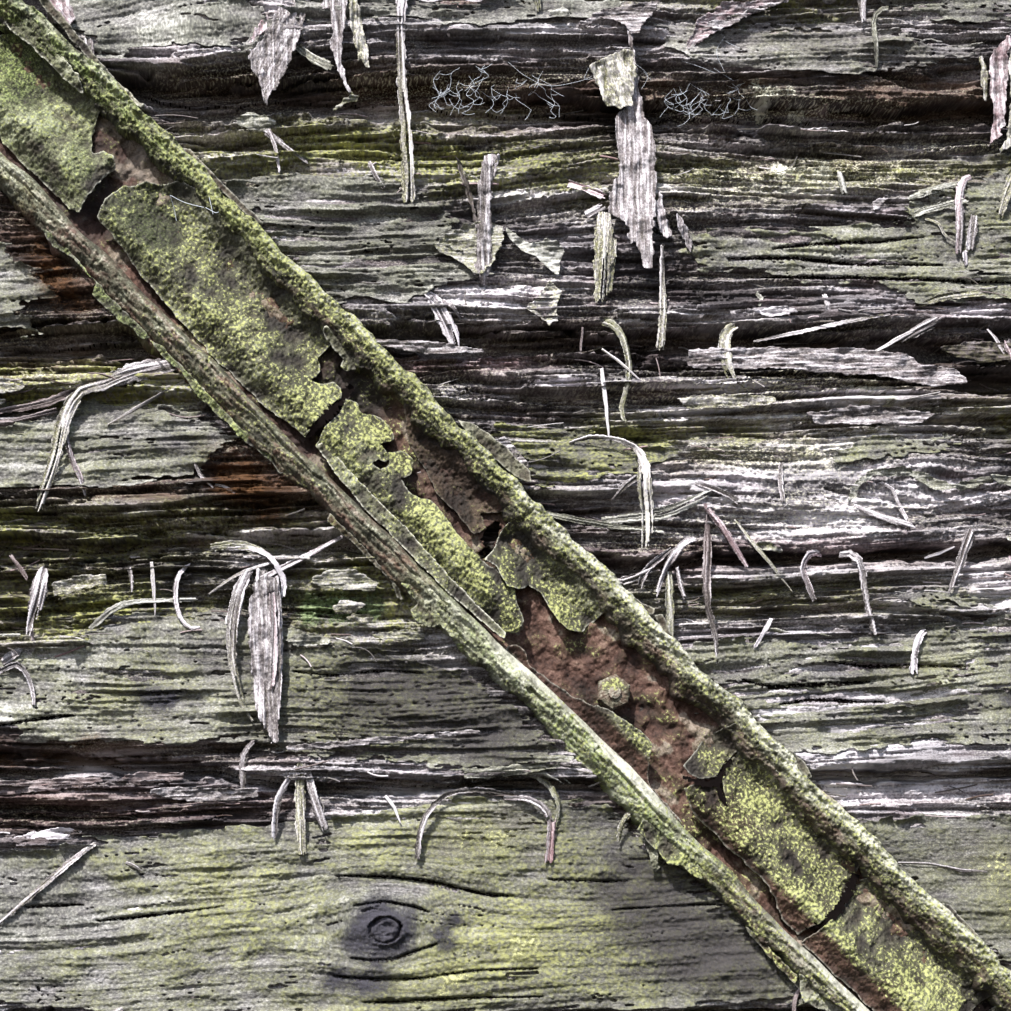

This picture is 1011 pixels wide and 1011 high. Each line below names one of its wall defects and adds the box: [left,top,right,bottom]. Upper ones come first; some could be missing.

peeling [0,242,57,339]
peeling [0,358,240,512]
peeling [50,0,1011,355]
peeling [491,317,1011,754]
peeling [0,535,807,1011]